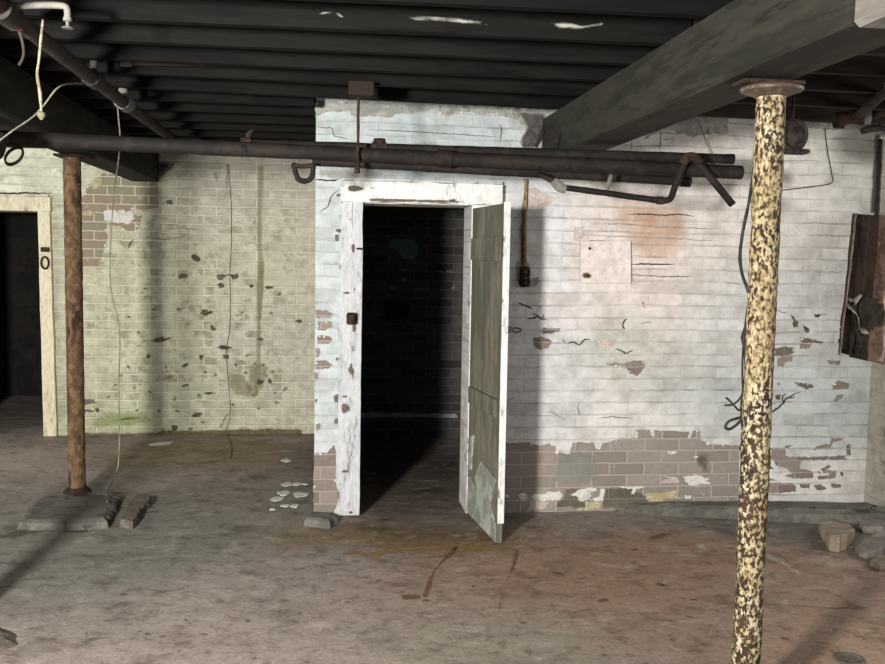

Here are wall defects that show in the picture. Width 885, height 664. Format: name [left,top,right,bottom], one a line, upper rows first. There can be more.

flaking render [82,173,173,267]
flaking render [314,309,333,381]
crack [772,391,801,413]
flaking render [504,429,740,513]
flaking render [769,438,851,493]